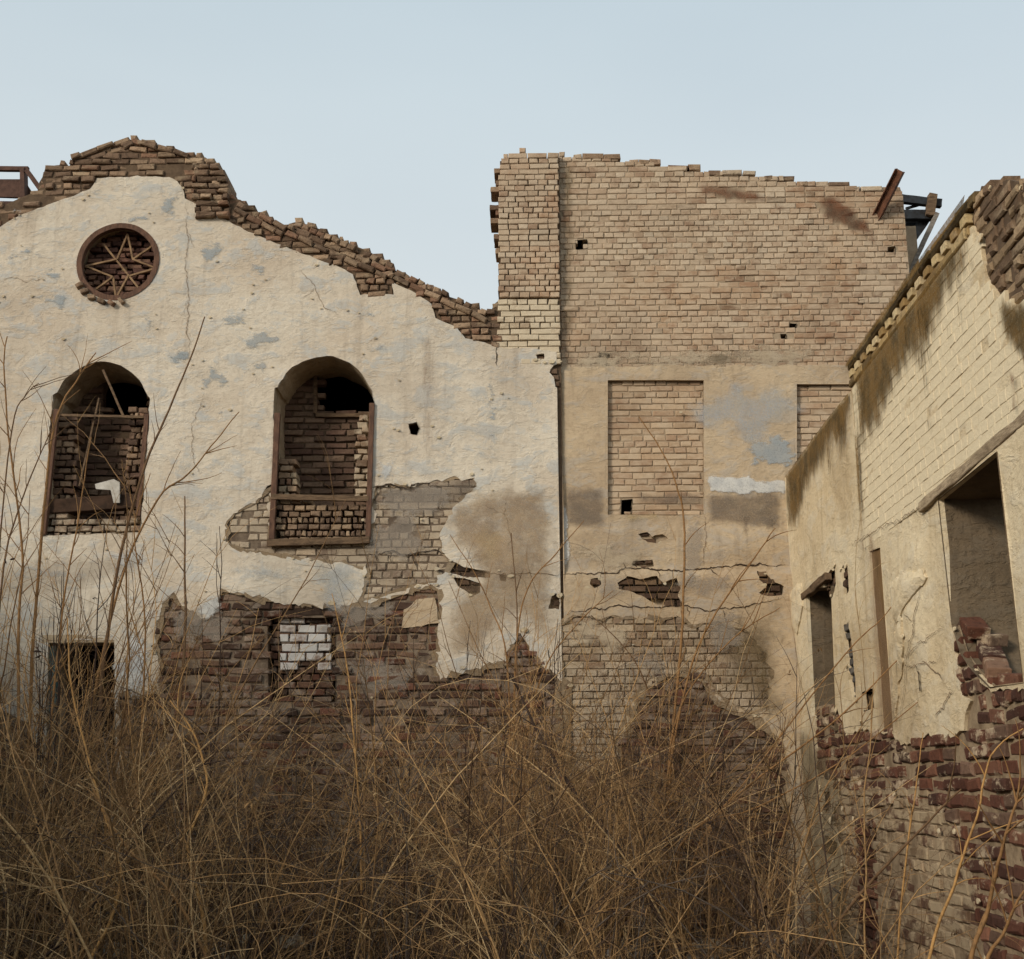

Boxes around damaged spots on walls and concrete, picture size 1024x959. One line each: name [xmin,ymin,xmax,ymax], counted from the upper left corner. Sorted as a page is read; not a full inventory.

leakage [712,241,965,525]
leakage [846,195,965,367]
leakage [1000,301,1024,361]
flaking render [111,463,796,951]
leakage [456,496,546,645]
crack [492,516,785,686]
flaking render [812,622,1024,959]
crack [898,587,952,733]